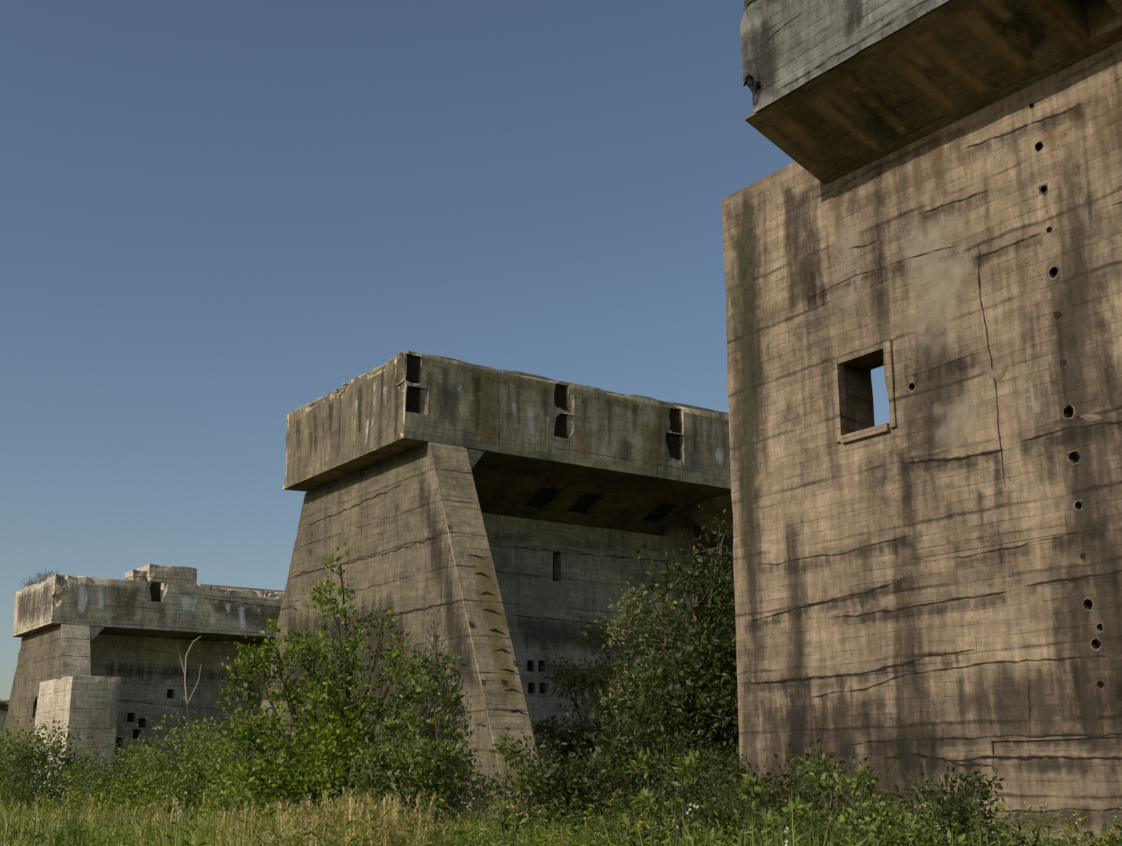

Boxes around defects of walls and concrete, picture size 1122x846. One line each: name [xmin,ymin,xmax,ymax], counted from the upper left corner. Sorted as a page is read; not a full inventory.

damp [715,199,764,643]
damp [900,324,963,523]
crack [811,232,1122,487]
damp [958,166,1122,773]
damp [18,585,52,621]
damp [78,583,135,620]
damp [210,602,279,629]
damp [745,531,969,822]